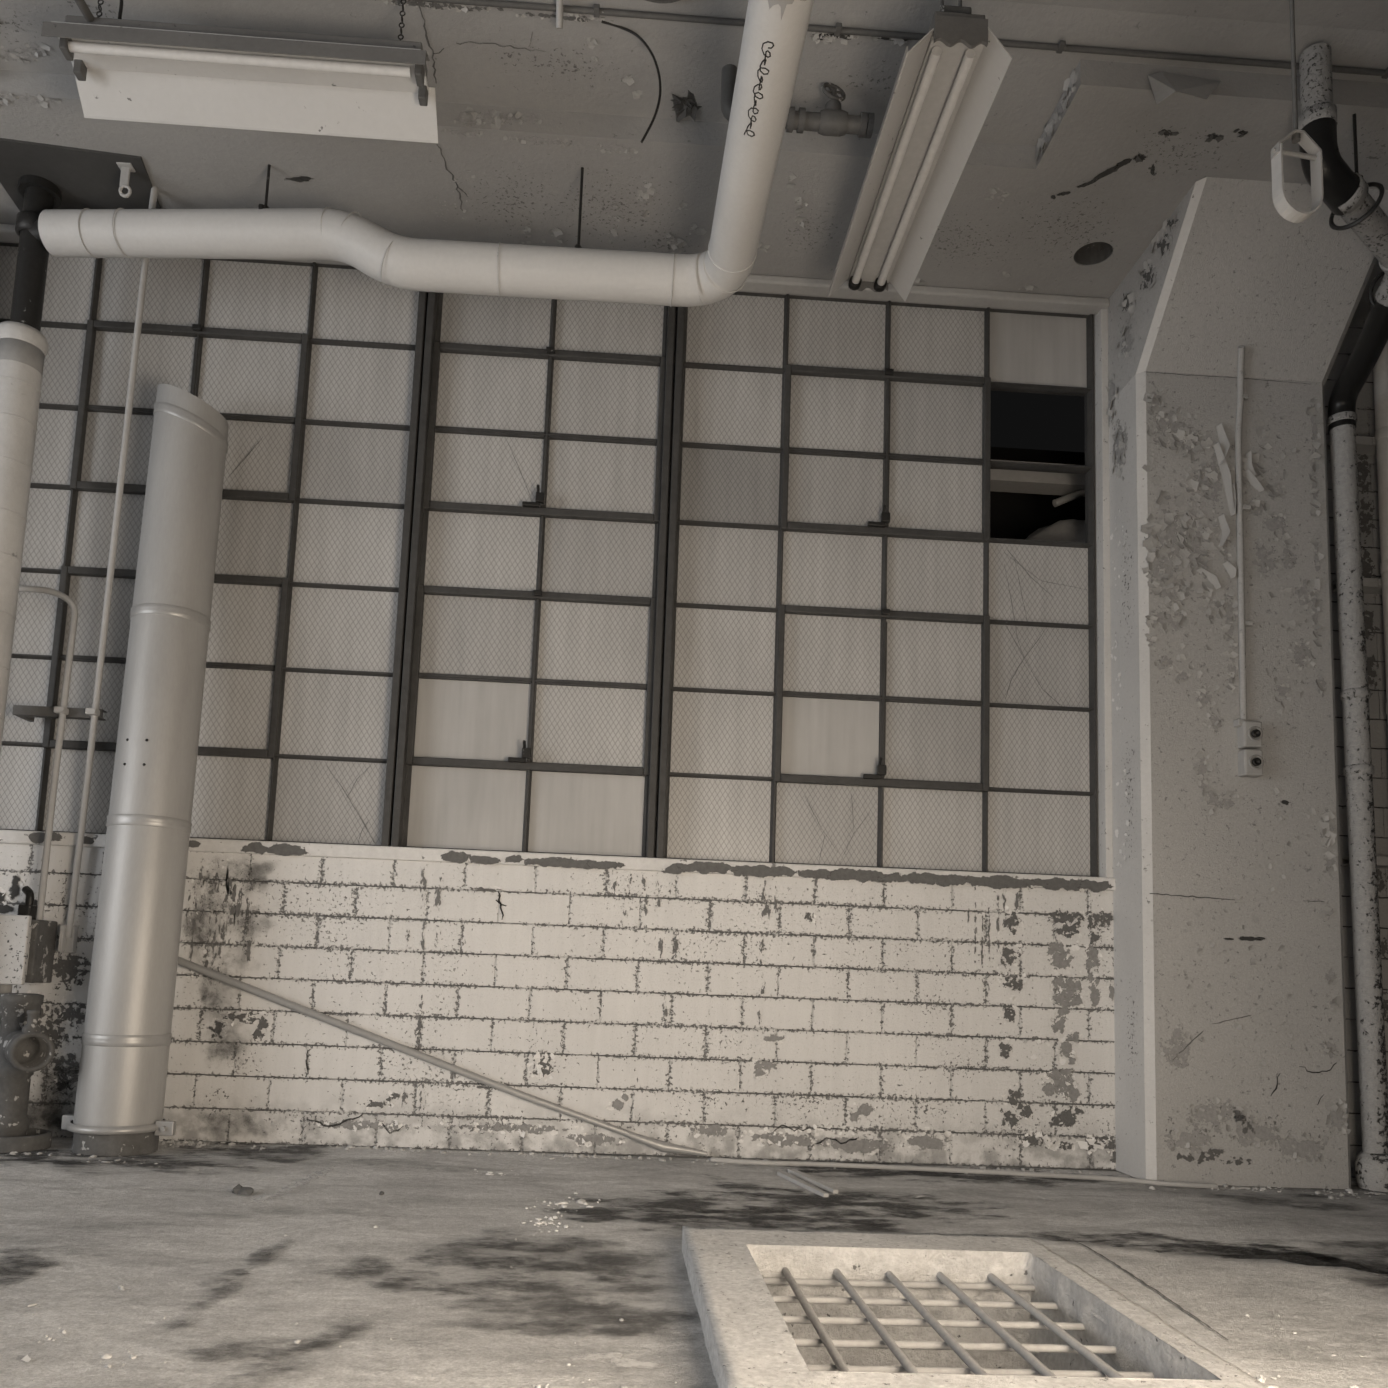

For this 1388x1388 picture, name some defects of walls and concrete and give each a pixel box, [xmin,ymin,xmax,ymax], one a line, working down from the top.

peeling [1105,212,1179,481]
peeling [1306,398,1324,647]
peeling [28,832,62,844]
peeling [181,840,308,980]
peeling [440,851,1138,1163]
peeling [1159,1097,1351,1165]
damp [553,1163,1097,1232]
damp [0,1251,57,1283]
damp [460,1231,695,1334]
damp [571,1353,659,1368]